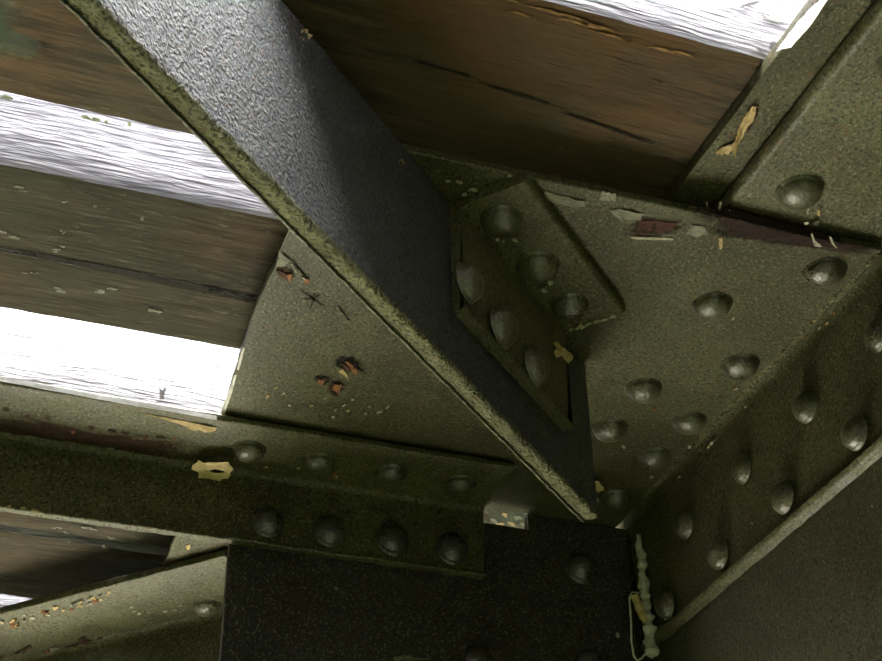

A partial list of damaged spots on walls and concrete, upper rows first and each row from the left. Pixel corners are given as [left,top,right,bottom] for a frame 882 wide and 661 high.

peeling [716,105,759,158]
peeling [544,190,585,208]
peeling [599,190,707,240]
peeling [553,341,574,363]
rust [314,356,364,395]
rust [0,409,187,460]
peeling [192,460,233,481]